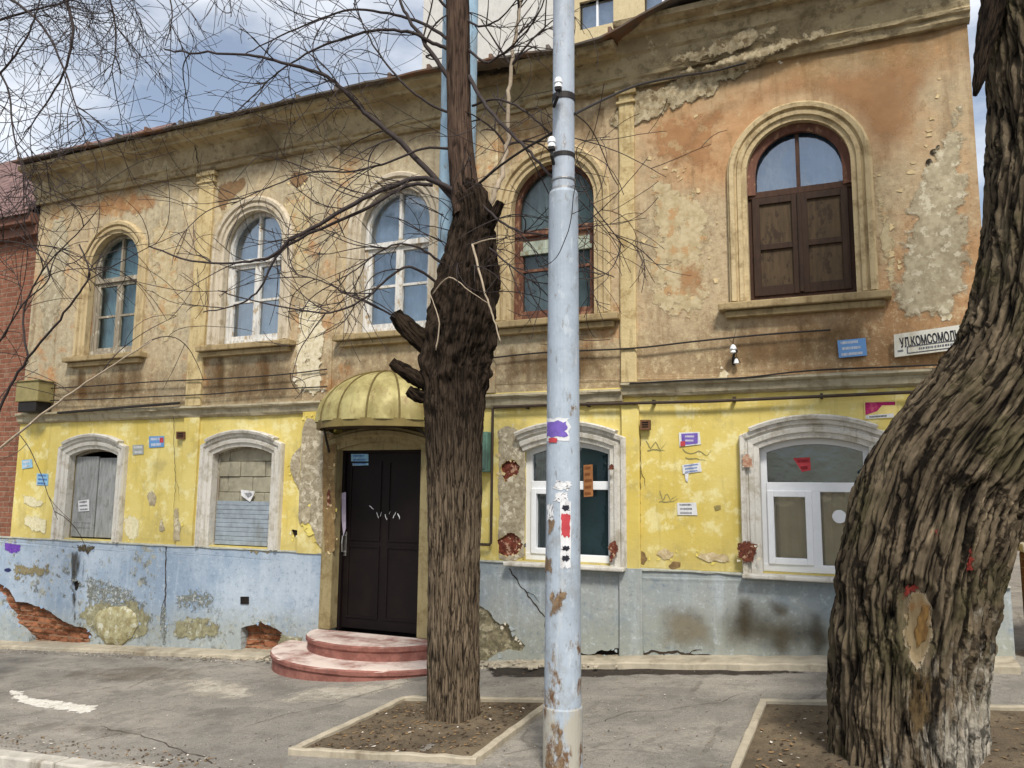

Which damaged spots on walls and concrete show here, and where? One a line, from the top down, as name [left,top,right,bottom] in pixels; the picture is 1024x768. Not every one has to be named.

peeling [634,25,831,321]
peeling [873,101,972,321]
peeling [22,495,46,533]
crack [160,417,179,637]
peeling [288,414,338,554]
peeling [495,426,526,561]
spalling [0,560,222,645]
spalling [245,622,302,649]
spalling [479,606,525,661]
crack [509,569,545,627]
water stain [735,602,822,648]